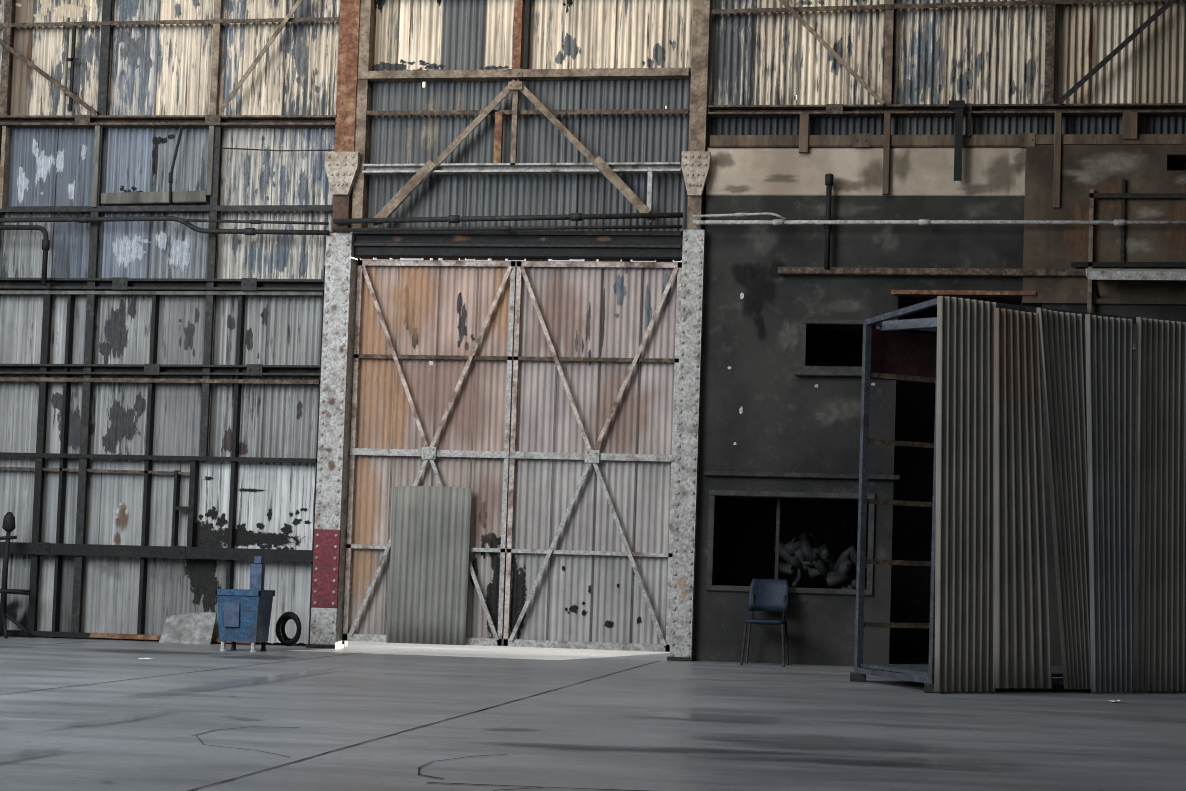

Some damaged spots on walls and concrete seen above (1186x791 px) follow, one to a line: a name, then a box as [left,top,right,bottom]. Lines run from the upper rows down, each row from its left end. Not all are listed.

peeling [34,0,91,22]
peeling [109,0,162,78]
peeling [282,27,320,95]
peeling [555,33,581,64]
peeling [642,40,675,68]
peeling [829,33,852,76]
peeling [904,38,982,102]
peeling [14,139,75,206]
peeling [457,292,475,351]
peeling [51,392,146,455]
crack [191,726,301,757]
crack [418,754,649,791]